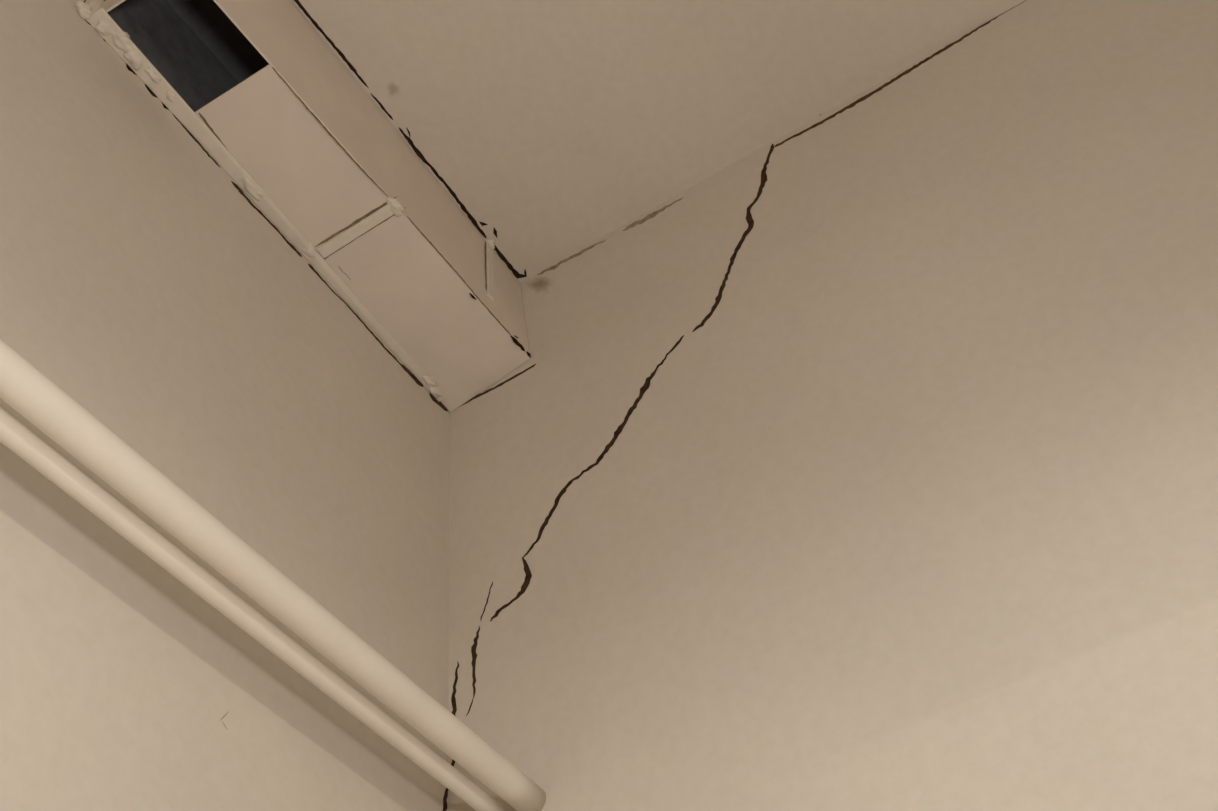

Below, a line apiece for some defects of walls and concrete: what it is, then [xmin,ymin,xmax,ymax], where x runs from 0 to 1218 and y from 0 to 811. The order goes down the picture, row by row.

crack [451,1,1025,716]
crack [443,759,455,811]